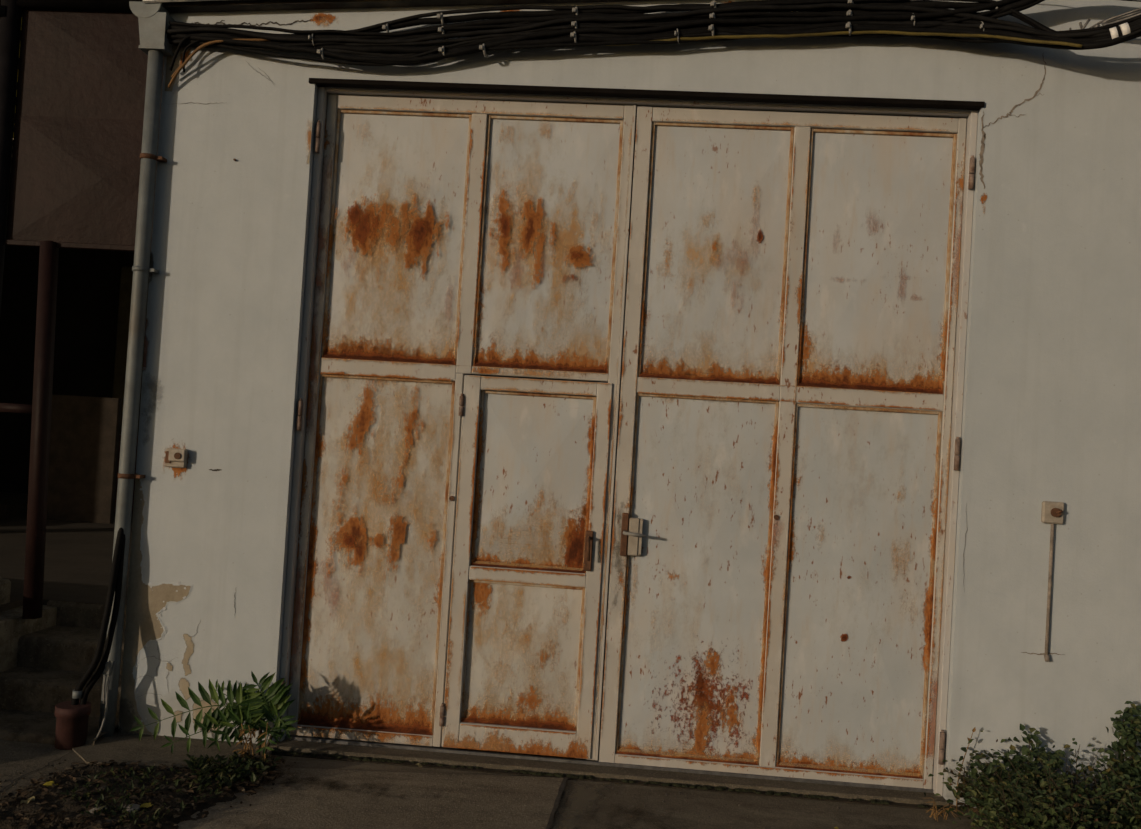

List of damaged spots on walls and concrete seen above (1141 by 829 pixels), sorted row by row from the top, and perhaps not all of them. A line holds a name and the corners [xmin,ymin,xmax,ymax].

rust [311,12,335,25]
crack [979,52,1047,189]
rust [288,128,965,781]
flaking render [118,470,193,735]
peeling [166,634,220,732]